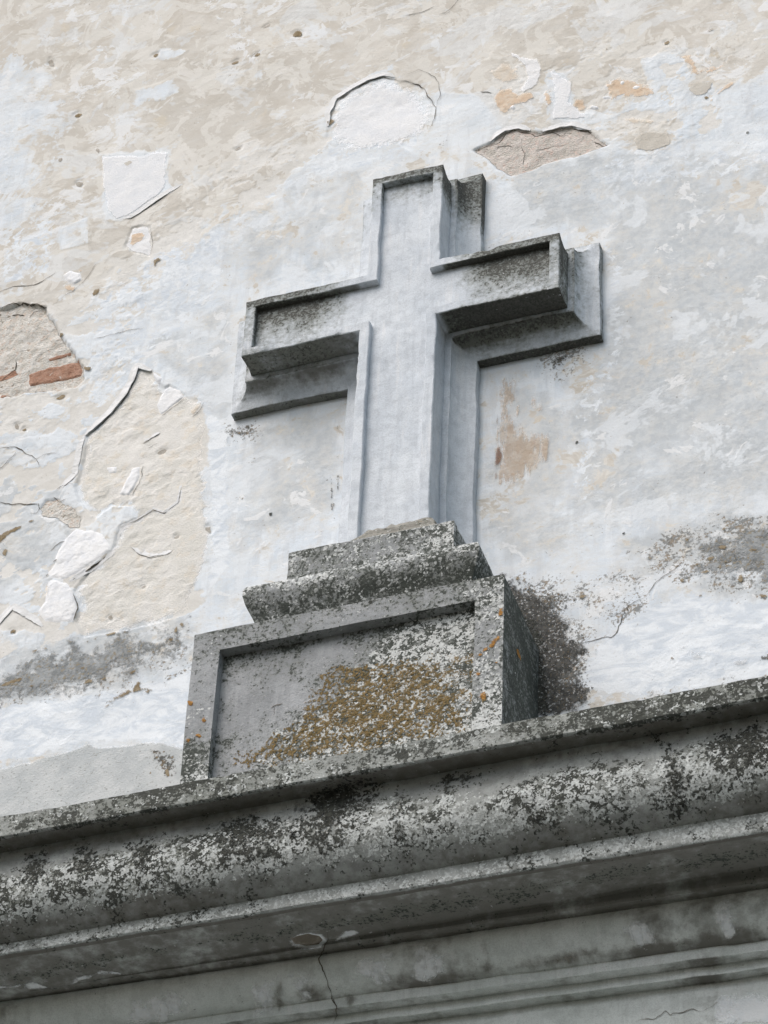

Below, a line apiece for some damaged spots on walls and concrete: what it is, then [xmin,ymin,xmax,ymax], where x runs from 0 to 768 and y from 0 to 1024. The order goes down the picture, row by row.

spalling [475,121,607,176]
spalling [0,302,91,400]
peeling [0,363,211,633]
water stain [500,574,594,716]
crack [580,561,686,644]
water stain [13,852,50,887]
water stain [63,843,100,886]
water stain [122,827,176,889]
water stain [199,773,383,873]
water stain [648,728,693,832]
crack [318,932,338,1019]
water stain [415,947,442,981]